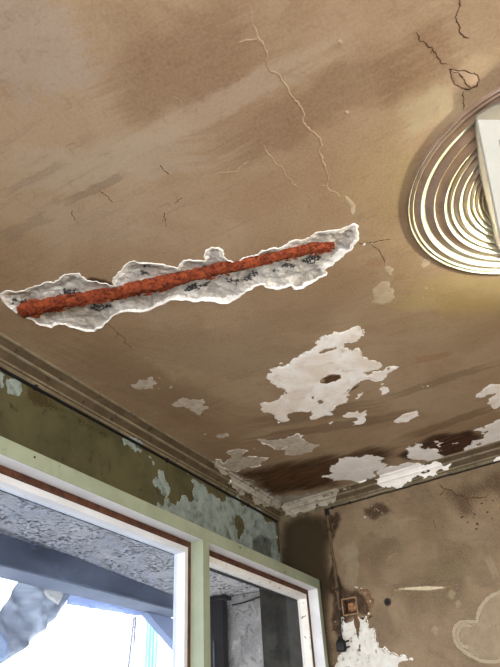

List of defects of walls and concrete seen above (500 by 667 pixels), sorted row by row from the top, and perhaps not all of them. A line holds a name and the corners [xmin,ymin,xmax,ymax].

crack [416,32,446,64]
crack [455,0,468,39]
crack [240,6,340,197]
spalling [0,223,359,332]
peeling [257,433,320,456]
peeling [149,441,451,562]
damp [241,448,389,494]
peeling [260,326,399,426]
peeling [464,419,500,451]
peeling [476,384,500,409]
damp [282,515,331,667]
peeling [335,586,413,667]